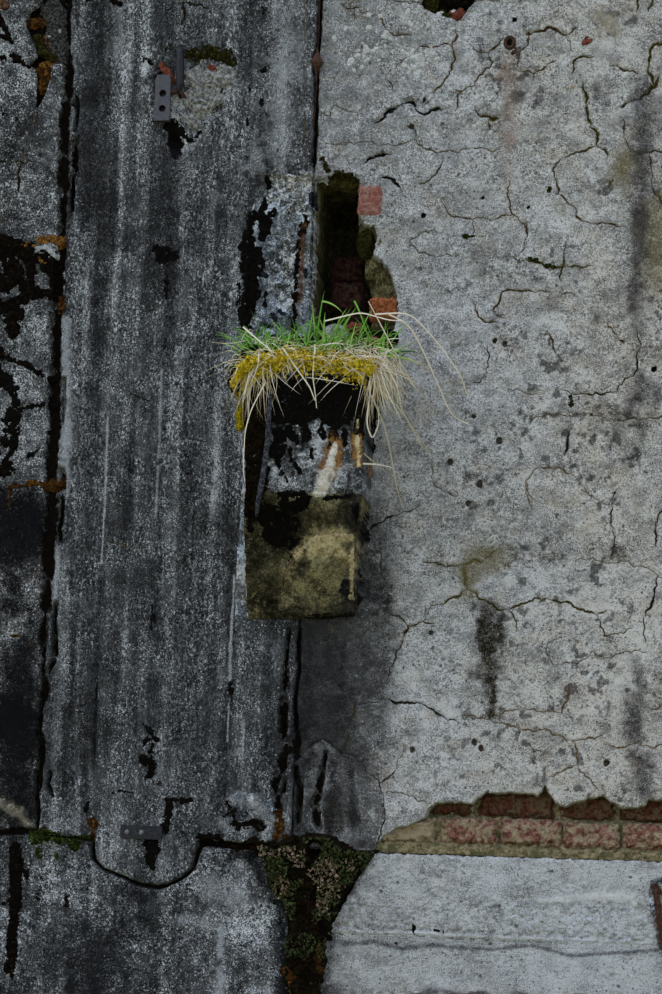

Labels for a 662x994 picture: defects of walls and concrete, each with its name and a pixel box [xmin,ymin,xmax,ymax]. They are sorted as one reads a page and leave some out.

spalling [419,0,477,21]
crack [301,0,662,323]
spalling [245,171,329,337]
corrosion [7,476,67,507]
crack [270,323,662,845]
leakage [460,545,504,720]
crack [92,841,250,890]
corrosion [651,883,662,950]